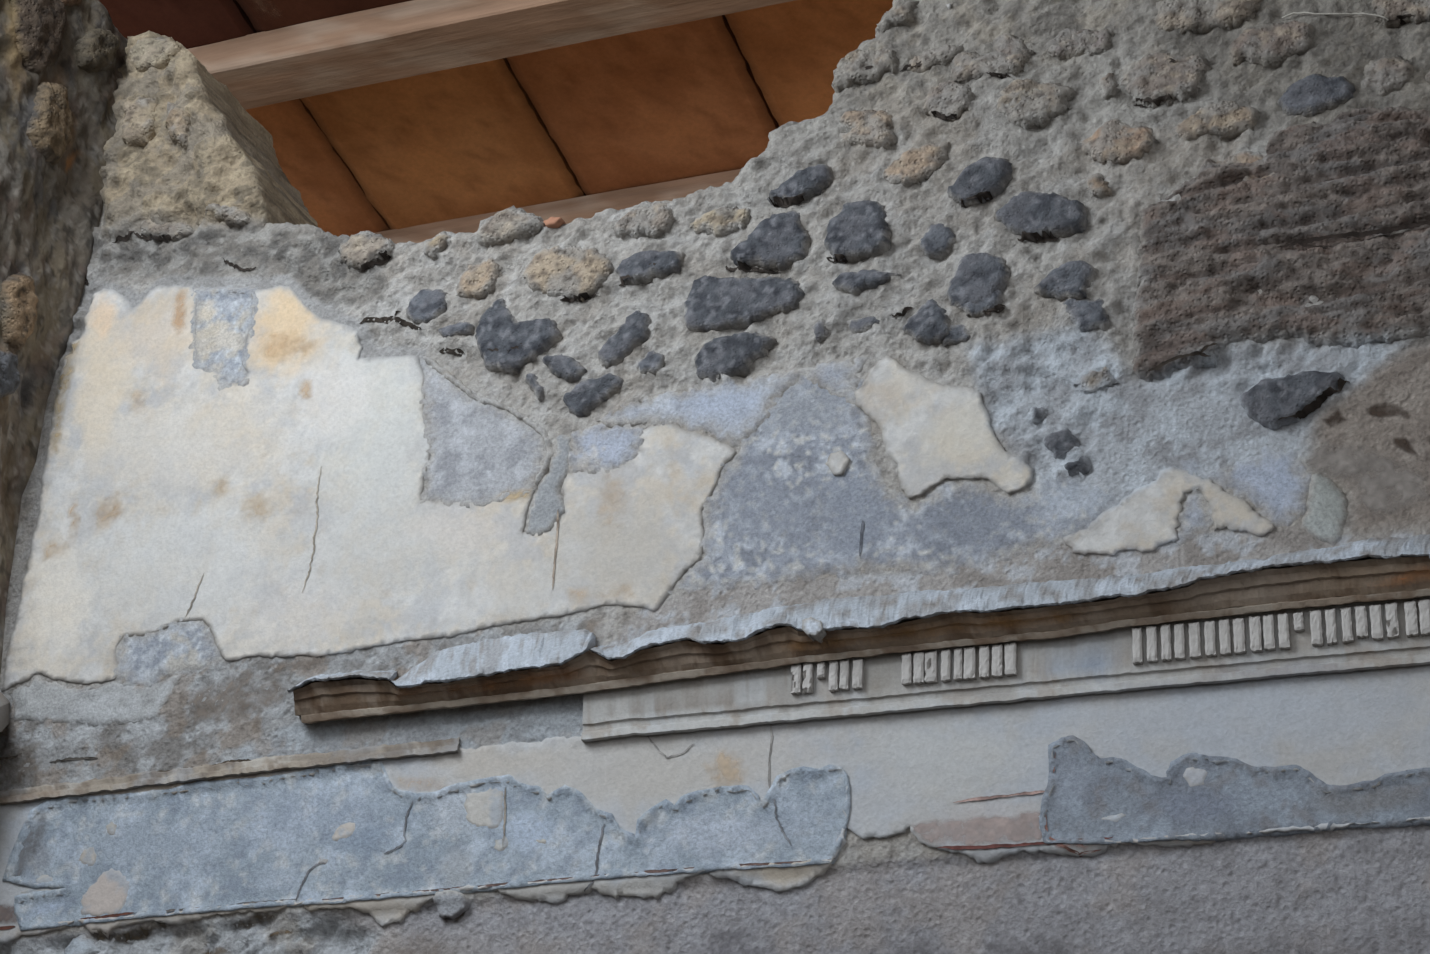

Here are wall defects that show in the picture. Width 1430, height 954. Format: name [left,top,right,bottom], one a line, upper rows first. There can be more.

peeling [188,285,259,391]
spalling [1325,411,1344,424]
spalling [1368,403,1407,417]
spalling [1394,438,1415,453]
crack [302,466,322,592]
peeling [112,617,222,687]
peeling [1039,735,1430,846]